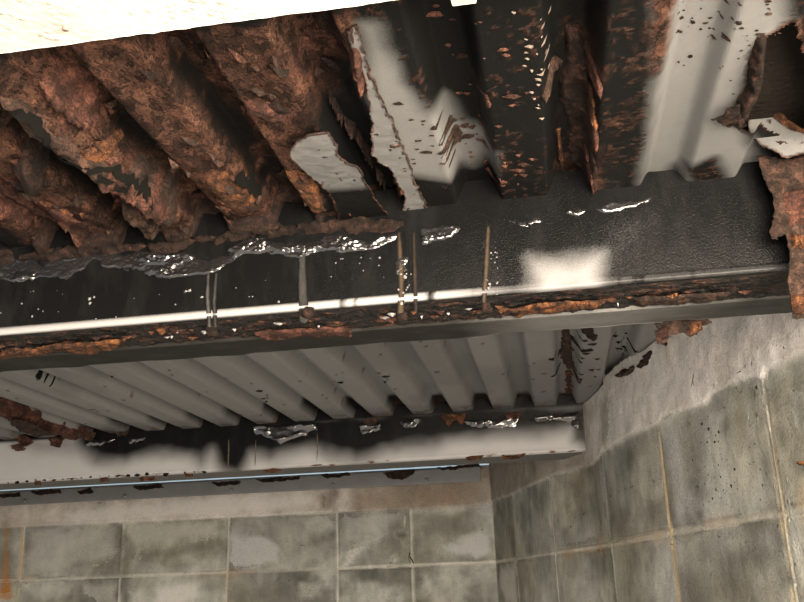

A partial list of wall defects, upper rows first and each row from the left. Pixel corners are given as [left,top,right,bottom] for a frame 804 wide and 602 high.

peeling [349,25,365,100]
peeling [328,89,403,197]
peeling [583,49,603,194]
peeling [773,112,804,133]
rust [0,338,128,360]
rust [0,175,249,266]
leakage [205,272,218,328]
leakage [298,256,309,324]
leakage [397,232,418,314]
rust [500,300,603,318]
rust [603,319,717,416]
rust [757,155,804,320]